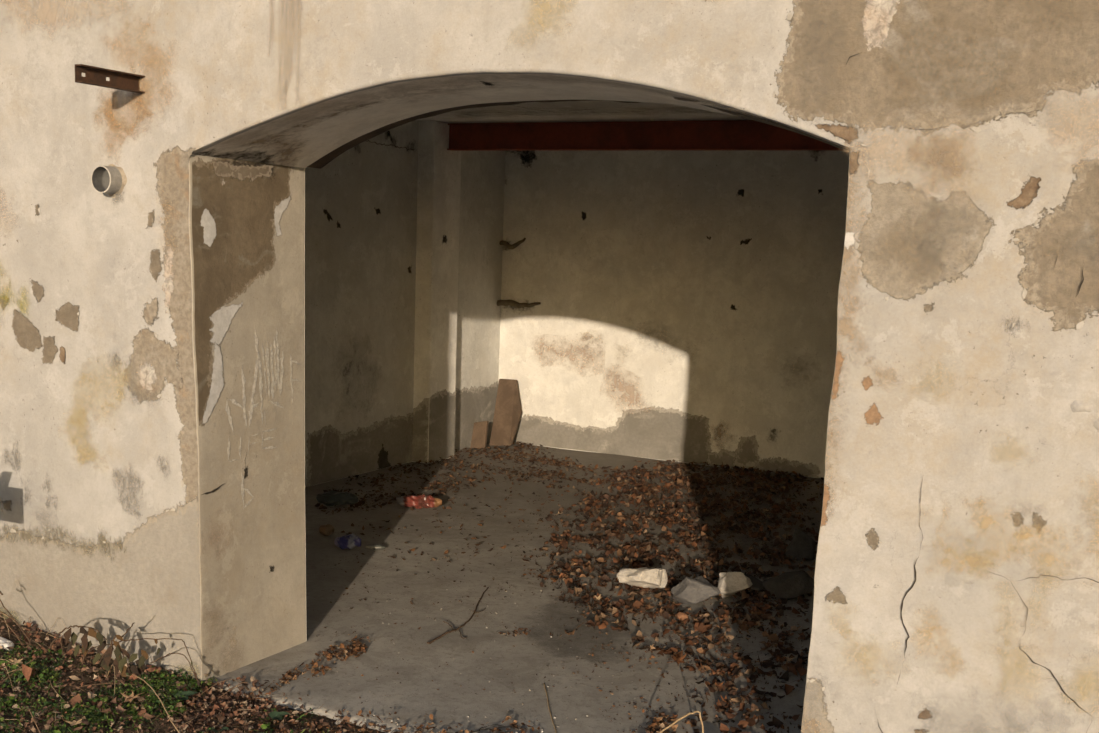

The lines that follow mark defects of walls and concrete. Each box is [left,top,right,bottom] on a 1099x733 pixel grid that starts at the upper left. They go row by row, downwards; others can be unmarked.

flaking render [674,0,1099,340]
peeling [0,141,299,681]
peeling [831,351,853,399]
peeling [801,678,834,733]
crack [898,478,923,680]
crack [988,571,1099,733]